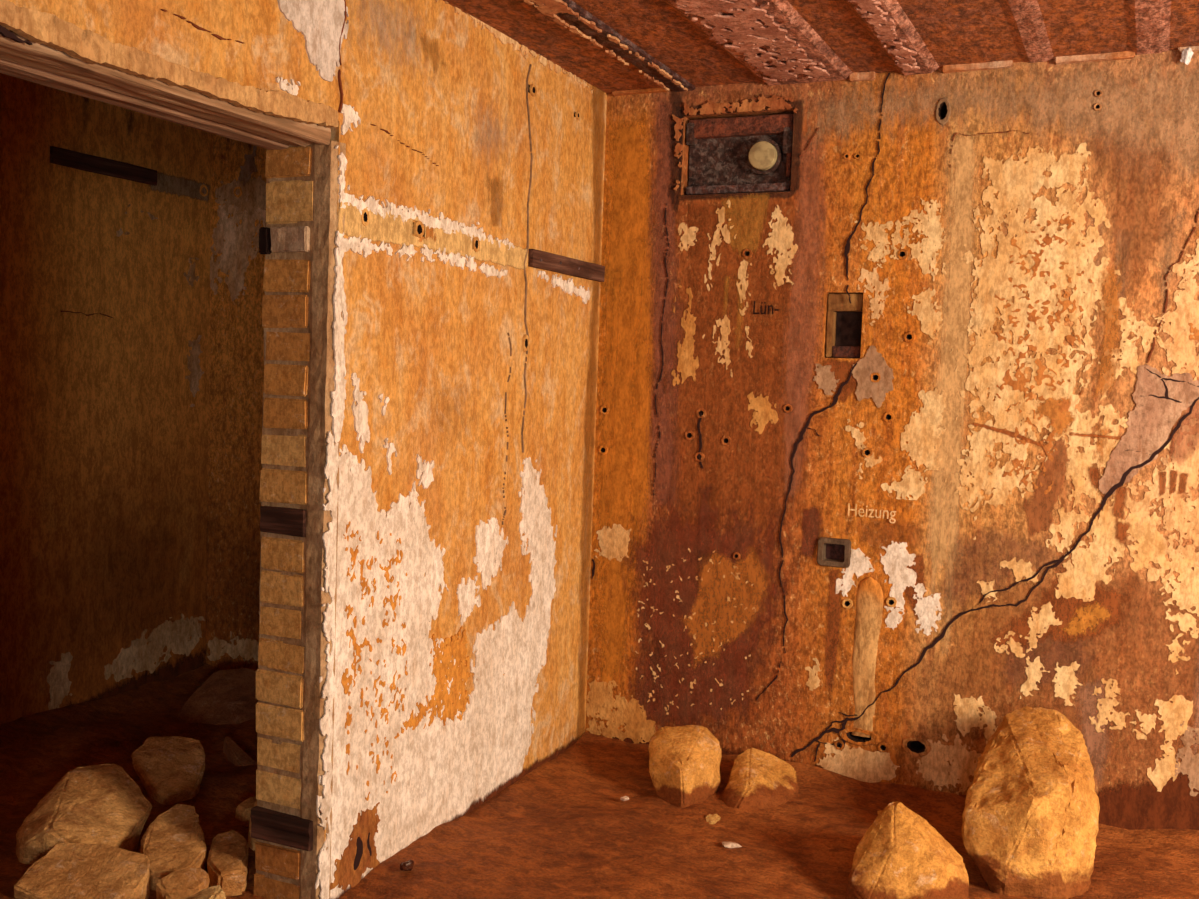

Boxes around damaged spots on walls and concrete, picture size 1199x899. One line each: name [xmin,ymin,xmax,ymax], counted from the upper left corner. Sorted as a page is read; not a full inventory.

peeling [435,0,593,94]
peeling [537,271,590,304]
peeling [671,200,753,386]
peeling [763,205,798,289]
crack [844,73,890,303]
crack [950,130,1030,168]
peeling [0,0,557,899]
peeling [586,524,753,744]
crack [756,363,857,700]
peeling [836,541,942,636]
crack [791,212,1199,762]
peeling [855,142,1199,796]